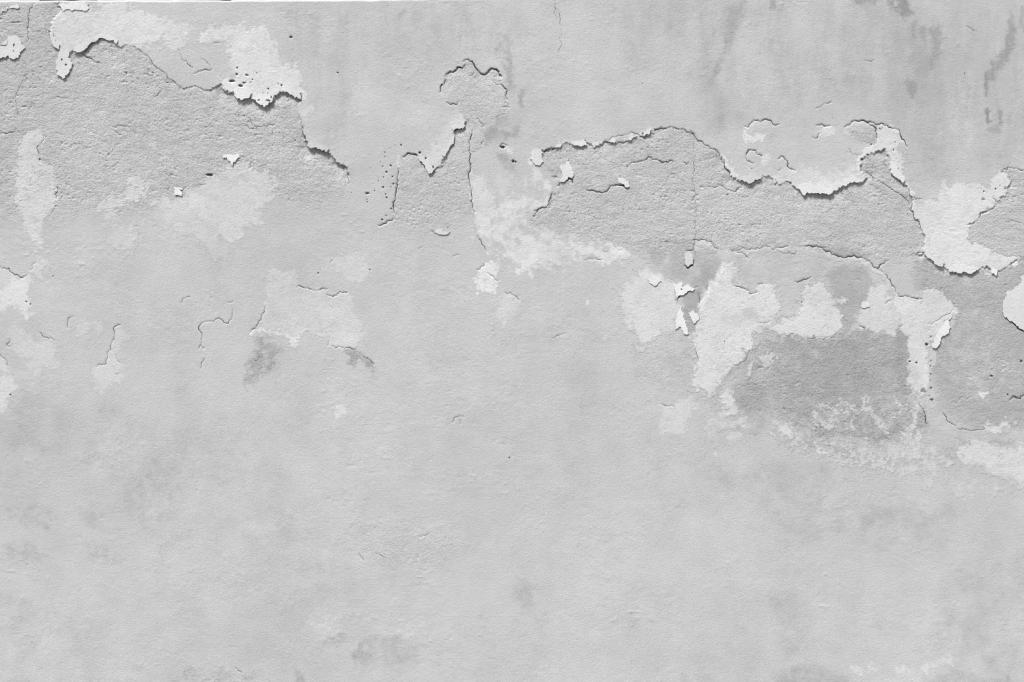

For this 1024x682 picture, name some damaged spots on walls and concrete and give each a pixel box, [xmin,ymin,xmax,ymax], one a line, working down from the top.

spalling [0,0,352,268]
spalling [366,59,1024,508]
damp [626,229,1024,682]